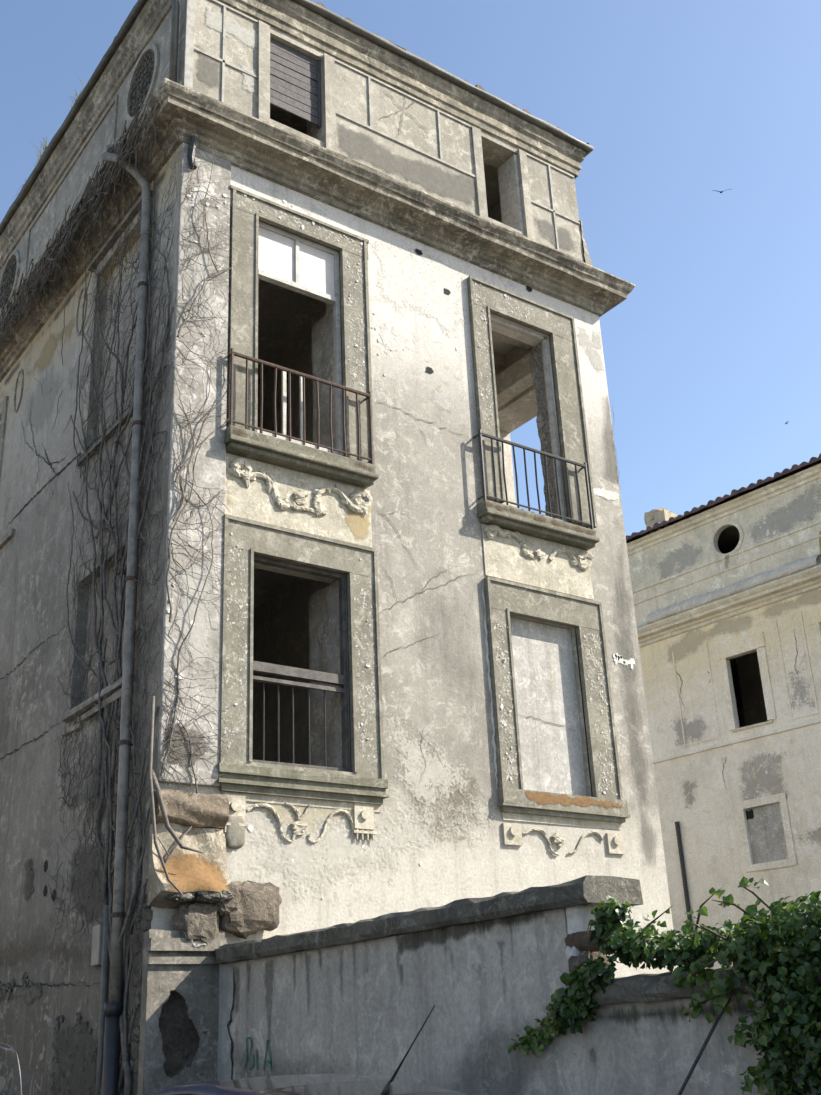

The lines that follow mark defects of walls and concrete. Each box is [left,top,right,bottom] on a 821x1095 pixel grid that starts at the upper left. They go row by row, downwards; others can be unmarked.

crack [379,86,430,138]
leakage [339,125,477,203]
crack [377,509,474,613]
peeling [164,716,492,948]
corrosion [526,791,622,809]
peeling [739,755,788,820]
leakage [398,911,542,952]
crack [0,980,101,988]
flaking render [159,990,207,1078]
crack [227,969,235,1079]